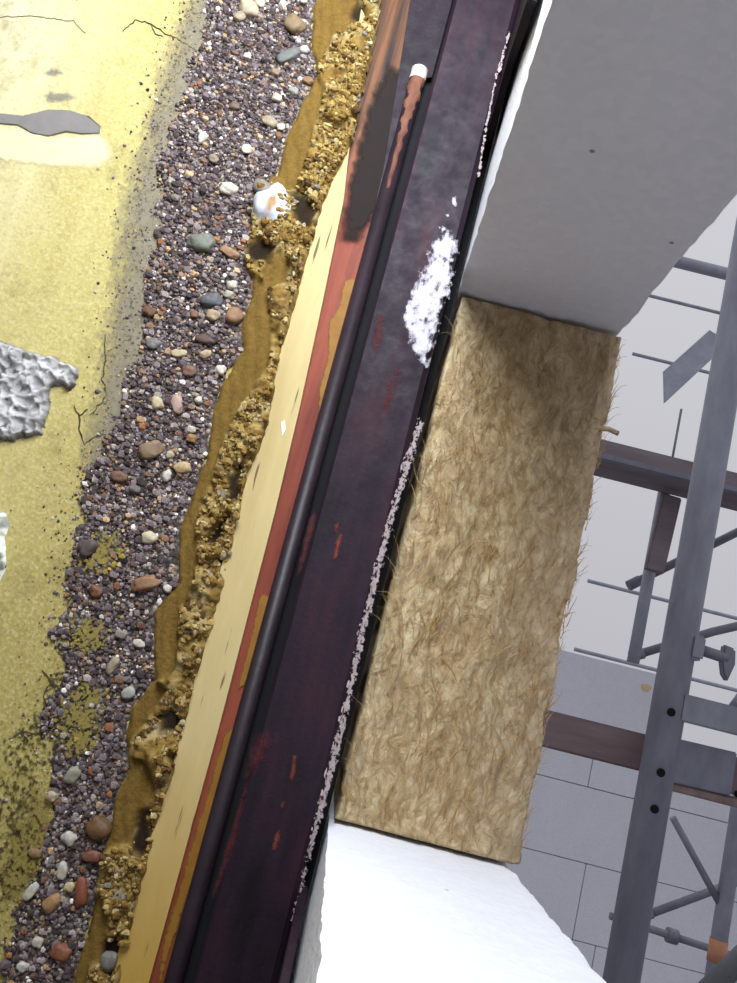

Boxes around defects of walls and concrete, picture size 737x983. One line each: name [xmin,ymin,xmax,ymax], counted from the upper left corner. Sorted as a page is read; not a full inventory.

crack [0,15,86,33]
crack [123,19,195,50]
corrosion [386,64,428,189]
flaking render [0,0,382,983]